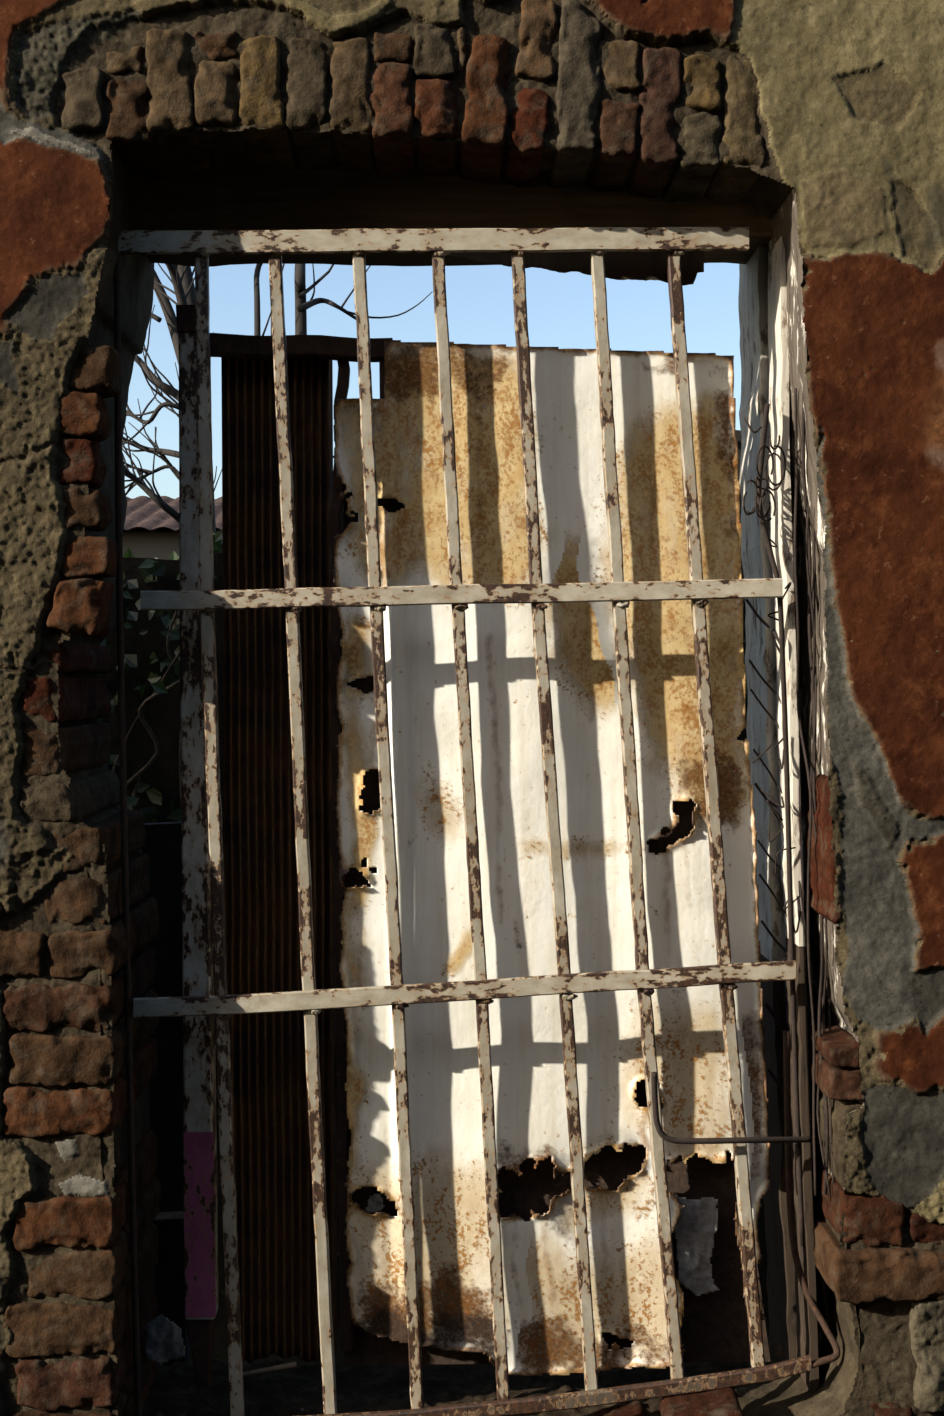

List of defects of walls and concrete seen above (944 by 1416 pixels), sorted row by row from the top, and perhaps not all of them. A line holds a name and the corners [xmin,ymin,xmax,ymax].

flaking render [0,0,944,275]
corrosion [334,342,742,585]
flaking render [0,435,114,992]
corrosion [339,610,379,987]
corrosion [546,602,615,719]
corrosion [626,599,749,832]
peeling [816,426,944,1036]
flaking render [0,1011,116,1314]
corrosion [345,1062,512,1366]
corrosion [500,1135,686,1376]
peeling [840,1084,944,1251]
flaking render [840,1299,944,1416]